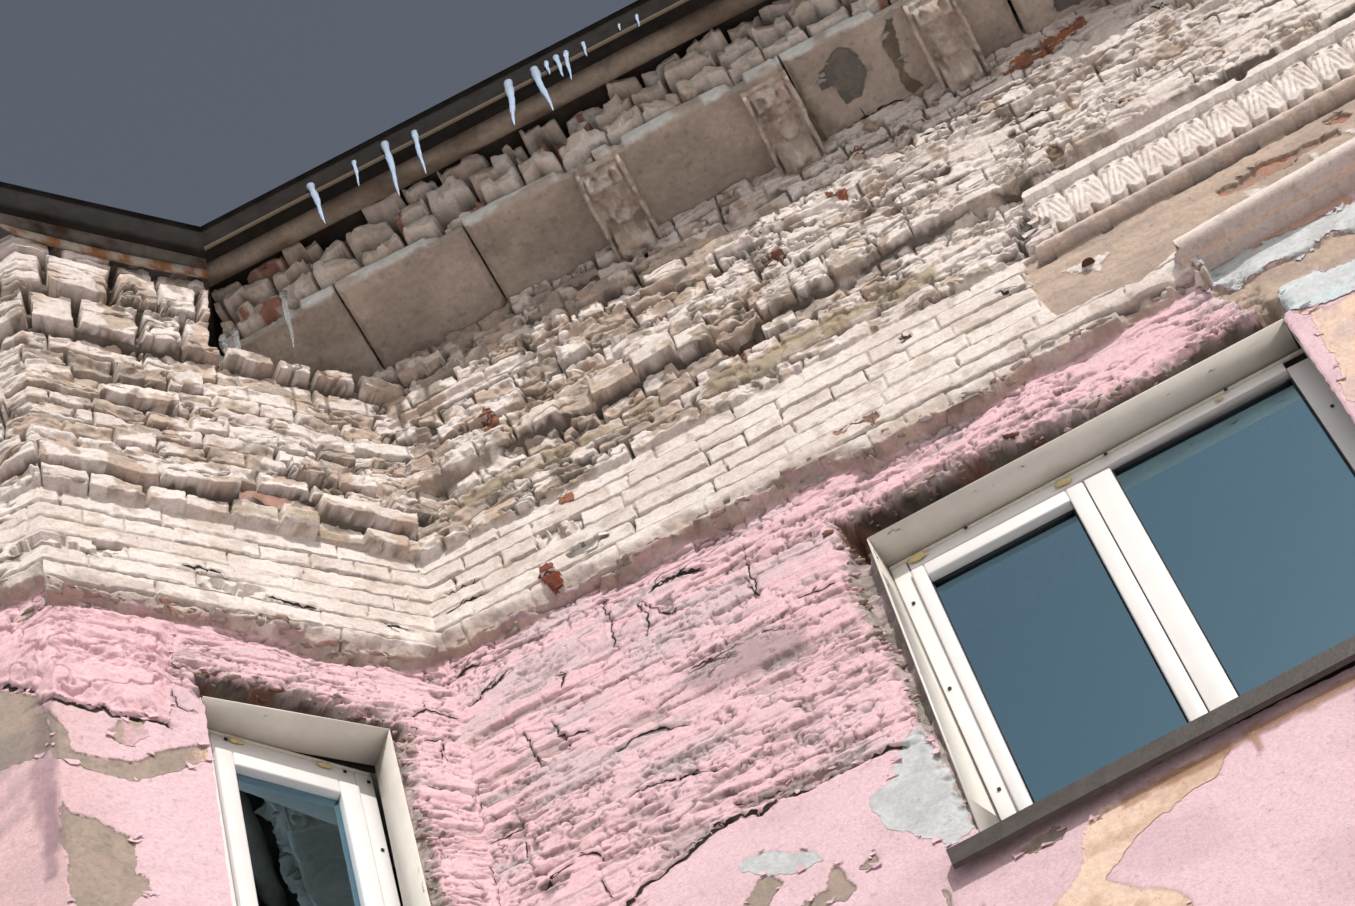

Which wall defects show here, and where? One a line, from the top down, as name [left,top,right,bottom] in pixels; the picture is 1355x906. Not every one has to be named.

flaking render [1127,231,1355,402]
crack [183,565,228,580]
crack [269,596,317,611]
crack [445,579,483,614]
flaking render [538,531,674,604]
crack [602,565,702,649]
crack [689,628,785,676]
peeling [822,474,976,848]
crack [405,657,907,906]
peeling [56,801,160,906]
peeling [738,846,882,906]
peeling [1053,748,1231,906]